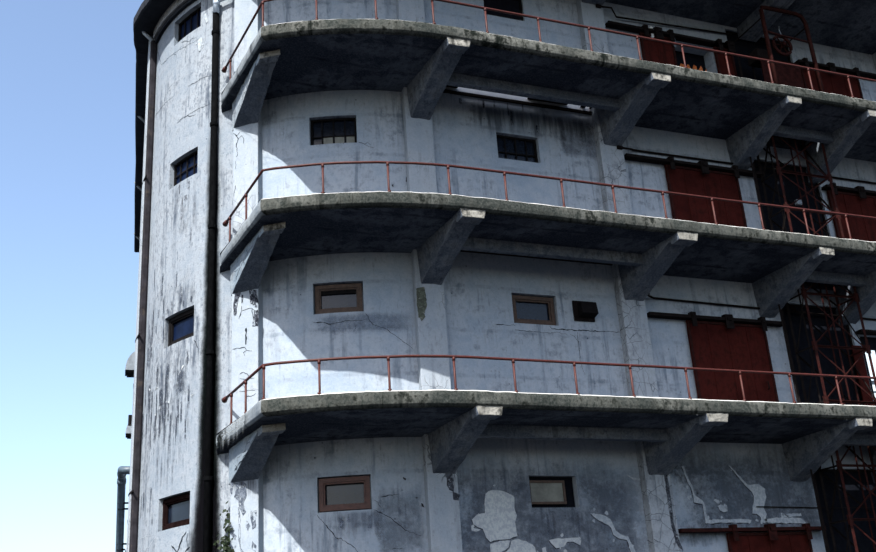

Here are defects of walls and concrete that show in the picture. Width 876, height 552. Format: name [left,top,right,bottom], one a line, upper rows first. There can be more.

damp [479,100,588,138]
damp [142,271,192,442]
damp [191,159,226,552]
peeling [233,290,259,326]
crack [313,314,413,349]
crack [376,494,421,549]
peeling [471,484,581,552]
peeling [591,508,635,552]